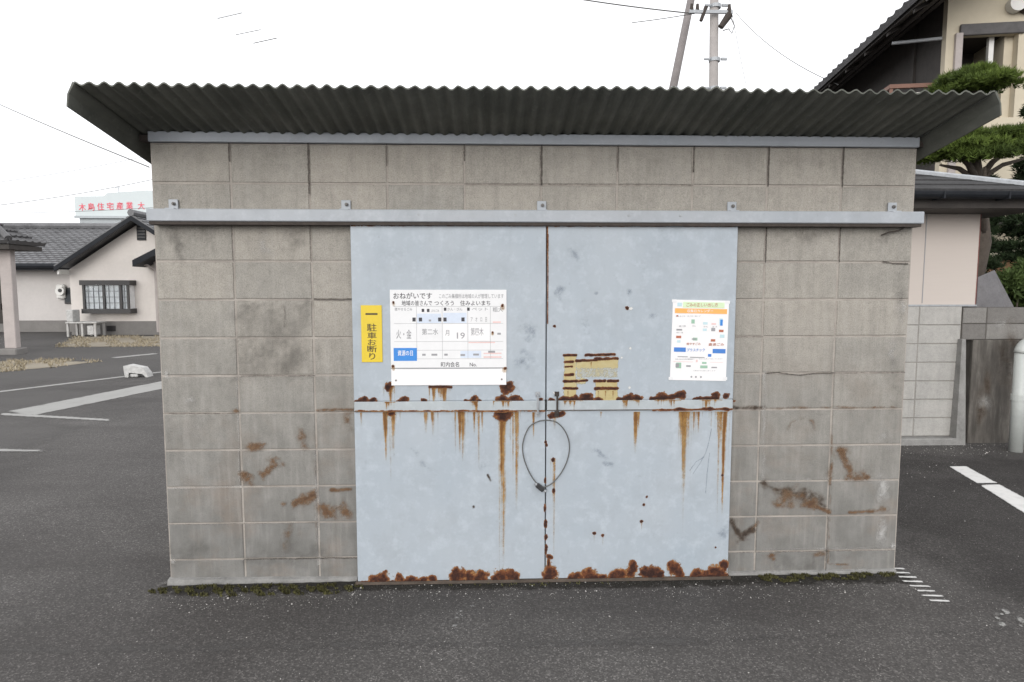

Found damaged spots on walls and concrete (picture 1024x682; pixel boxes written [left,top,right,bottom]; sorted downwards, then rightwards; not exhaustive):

corrosion [239,457,283,484]
corrosion [316,368,603,542]
corrosion [829,442,870,484]
corrosion [282,488,352,518]
corrosion [761,481,831,514]
corrosion [361,566,520,582]